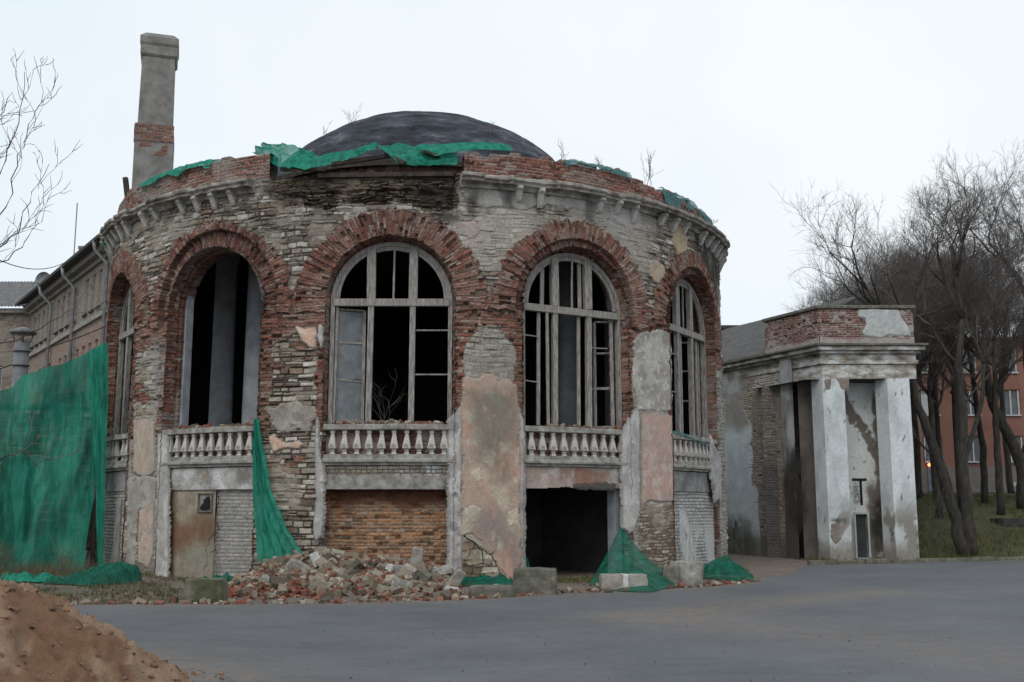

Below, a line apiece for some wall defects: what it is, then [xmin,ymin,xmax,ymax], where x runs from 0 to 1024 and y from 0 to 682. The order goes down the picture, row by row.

peeling [857,309,911,338]
peeling [126,418,172,577]
peeling [265,402,327,543]
crack [463,535,508,579]
peeling [445,372,527,579]
peeling [573,329,677,567]